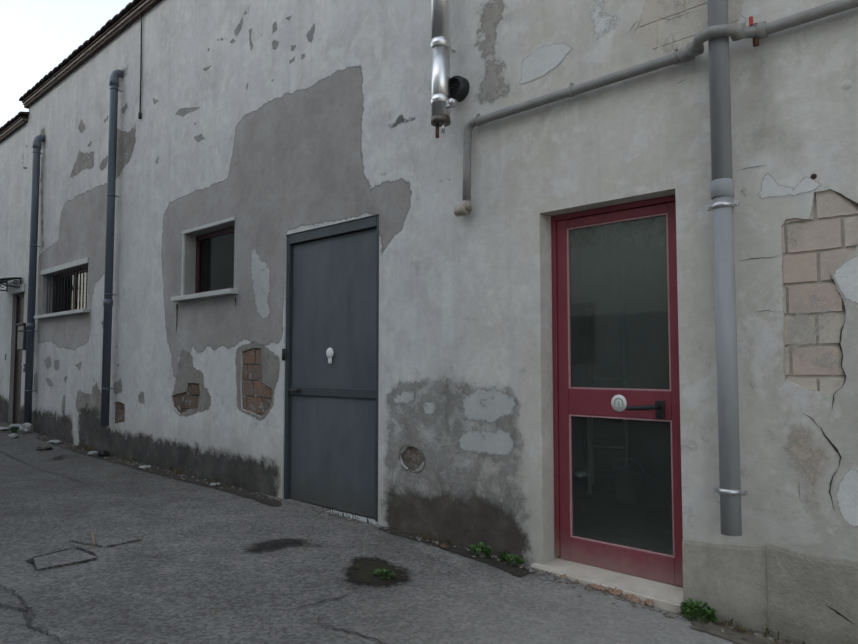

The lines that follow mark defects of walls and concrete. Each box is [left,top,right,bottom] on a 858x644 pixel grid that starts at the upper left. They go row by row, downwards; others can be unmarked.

flaking render [631,0,708,57]
flaking render [38,183,107,350]
flaking render [70,127,136,178]
flaking render [161,66,412,421]
flaking render [782,189,858,394]
crack [833,190,858,207]
crack [830,275,846,408]
flaking render [113,378,125,423]
water stain [20,406,279,497]
flaking render [381,379,523,520]
crack [802,413,841,510]
water stain [386,490,530,562]